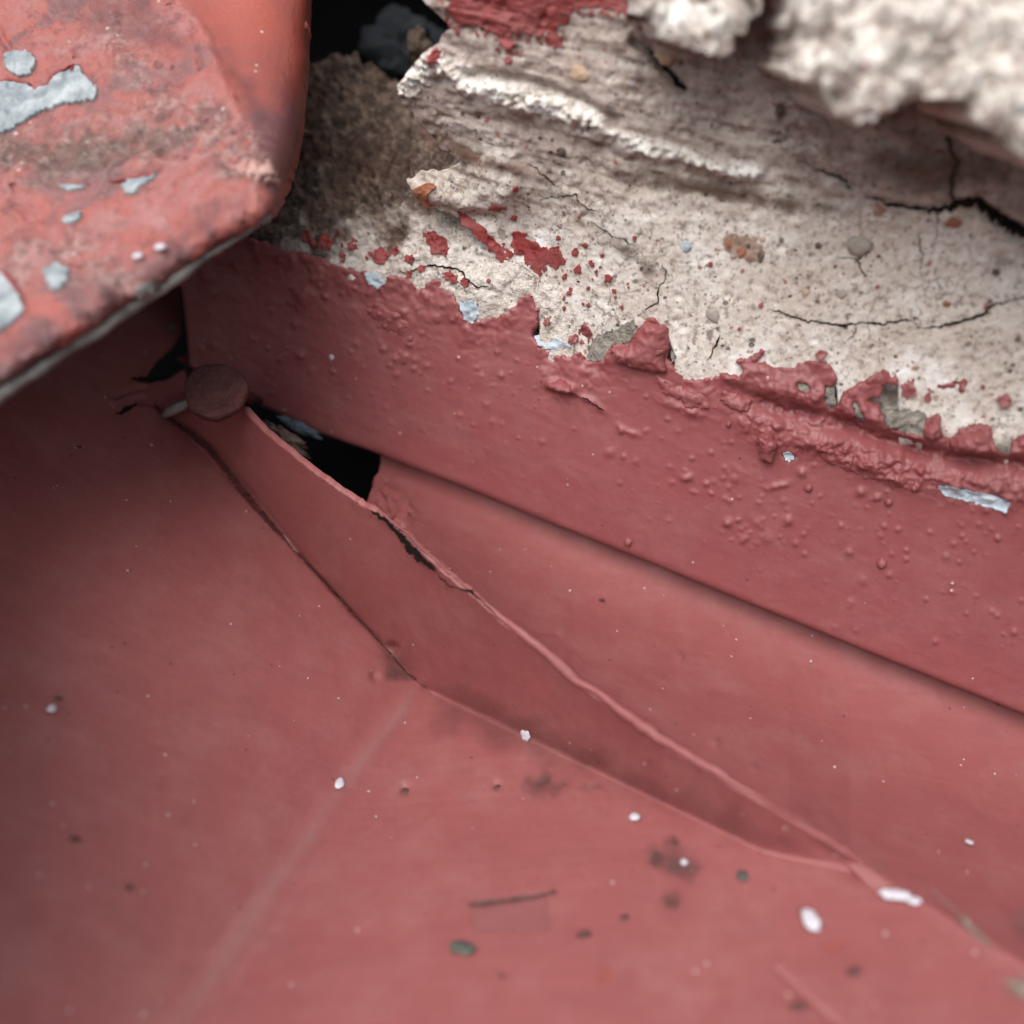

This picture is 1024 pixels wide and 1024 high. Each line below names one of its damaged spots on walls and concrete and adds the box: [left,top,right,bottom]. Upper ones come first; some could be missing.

peeling [0,49,98,135]
peeling [0,270,25,334]
peeling [422,231,449,257]
crack [400,264,488,288]
peeling [457,205,630,311]
crack [528,164,633,245]
crack [643,263,667,311]
spalling [723,232,766,264]
crack [771,297,1024,340]
crack [814,134,1024,291]
peeling [938,486,1010,513]
crack [371,510,495,613]